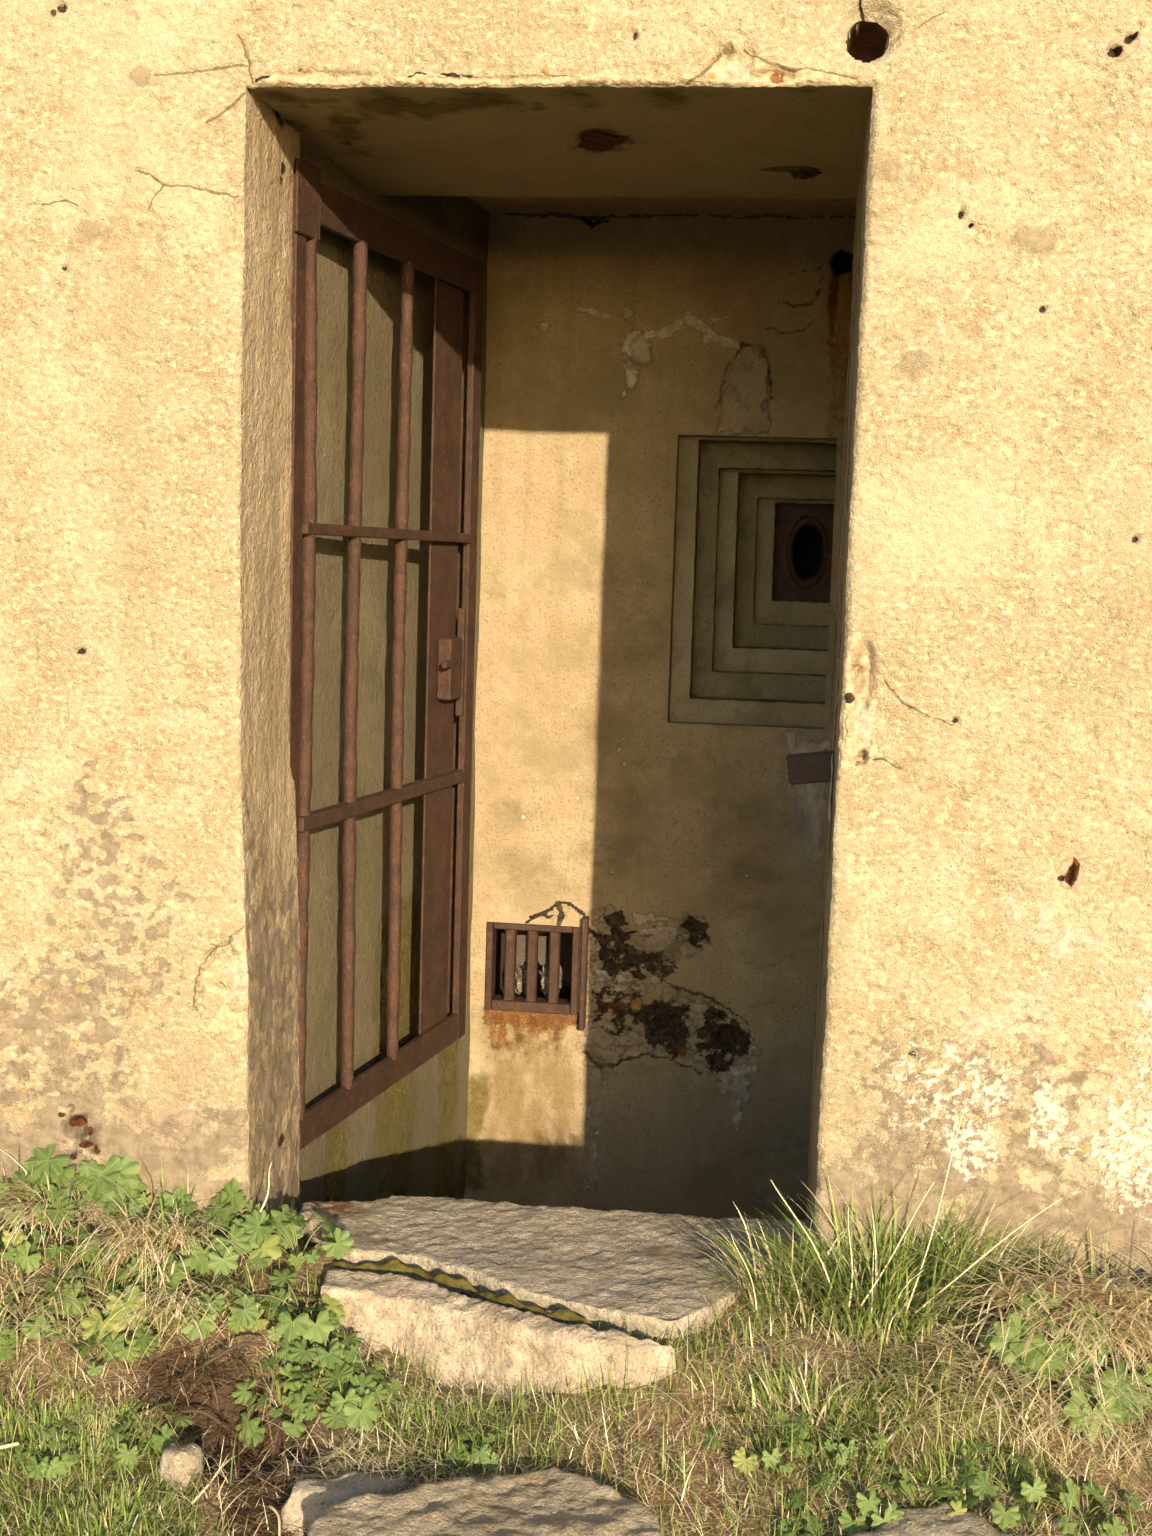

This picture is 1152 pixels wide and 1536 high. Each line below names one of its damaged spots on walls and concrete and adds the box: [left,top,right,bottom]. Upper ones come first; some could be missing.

rust [578,129,631,153]
rust [484,1009,579,1049]
spalling [576,905,762,1132]
spalling [58,1104,100,1160]
leakage [815,1016,1152,1290]